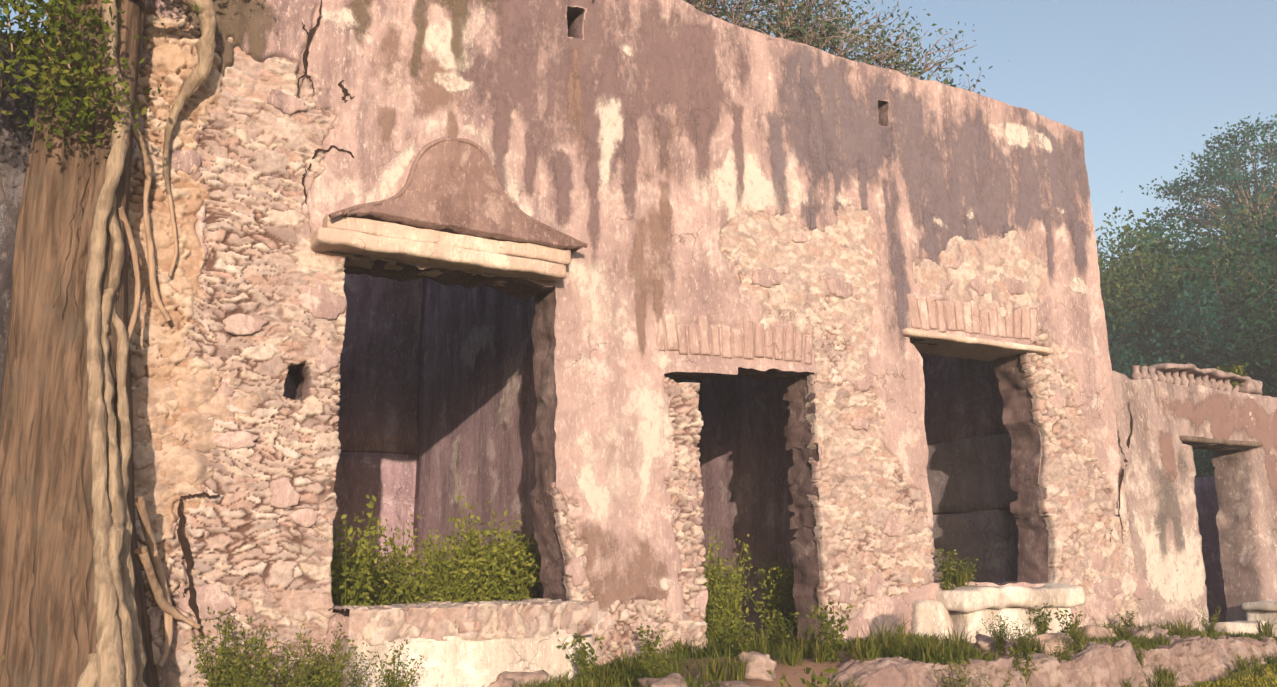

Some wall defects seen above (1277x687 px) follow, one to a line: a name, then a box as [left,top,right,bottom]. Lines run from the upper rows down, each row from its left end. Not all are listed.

water stain [174,0,278,76]
crack [297,0,354,103]
water stain [349,0,371,39]
water stain [379,108,396,142]
water stain [382,0,747,353]
peeling [1069,277,1088,293]
spalling [127,8,371,687]
spalling [692,150,935,640]
spalling [1019,329,1204,630]